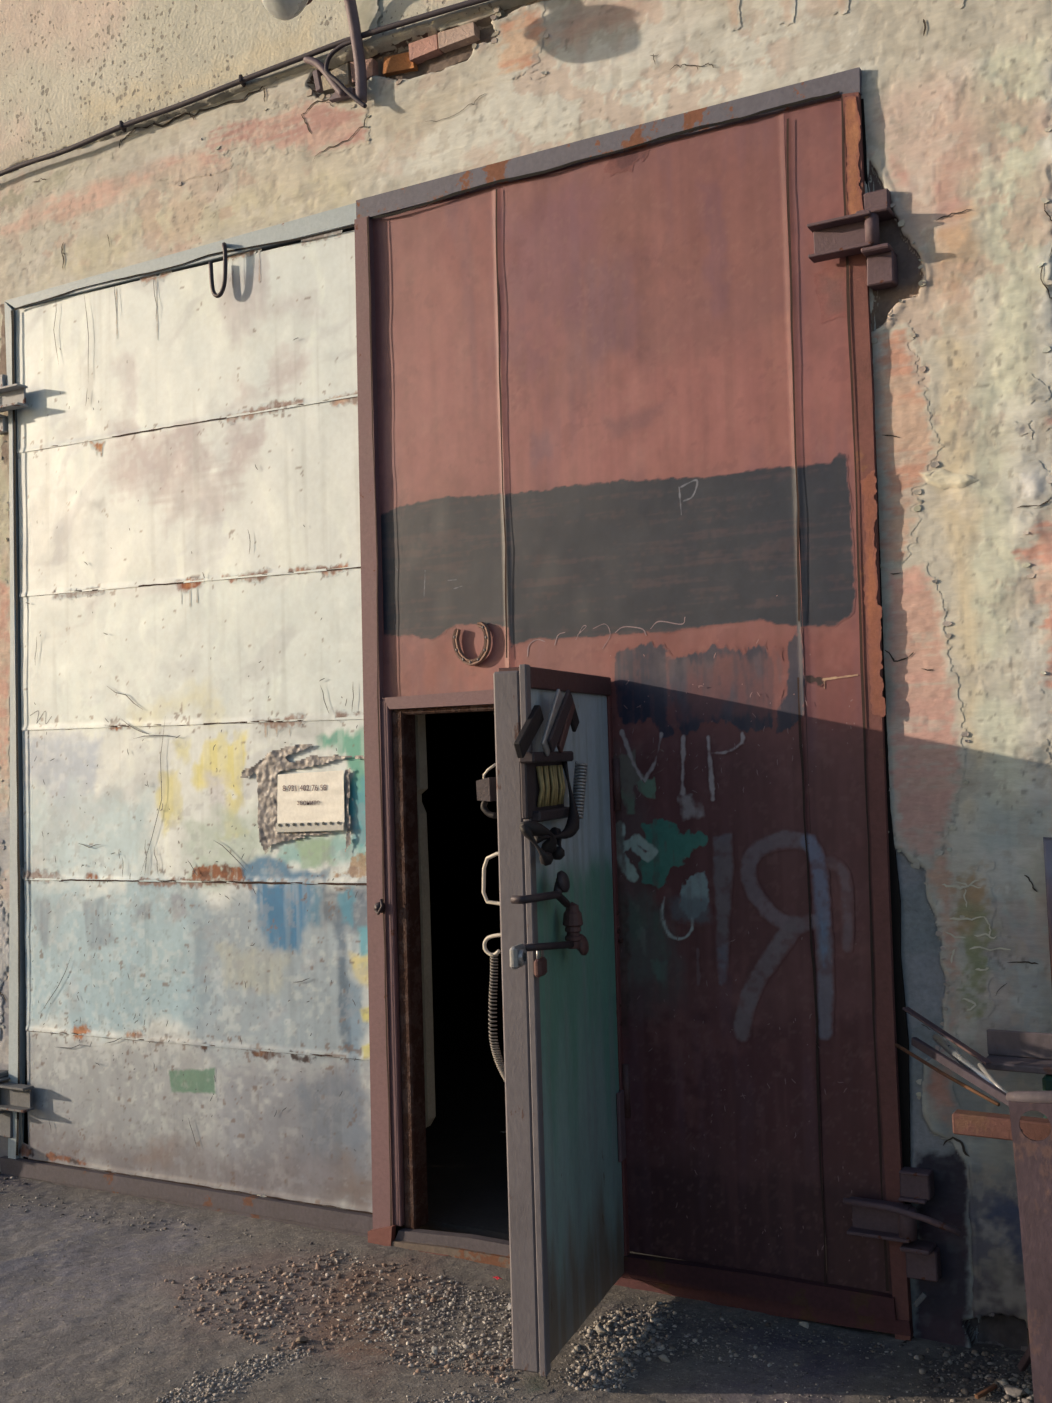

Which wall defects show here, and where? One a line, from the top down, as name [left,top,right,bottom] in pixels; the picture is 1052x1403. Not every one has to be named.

peeling [200,0,549,158]
rust [844,96,863,215]
crack [1040,203,1052,299]
rust [51,586,105,601]
rust [173,576,204,607]
rust [221,560,351,584]
rust [860,470,886,717]
peeling [1010,508,1052,690]
peeling [0,578,10,813]
peeling [868,161,978,1167]
rust [135,861,253,892]
flaking render [962,1266,1030,1349]